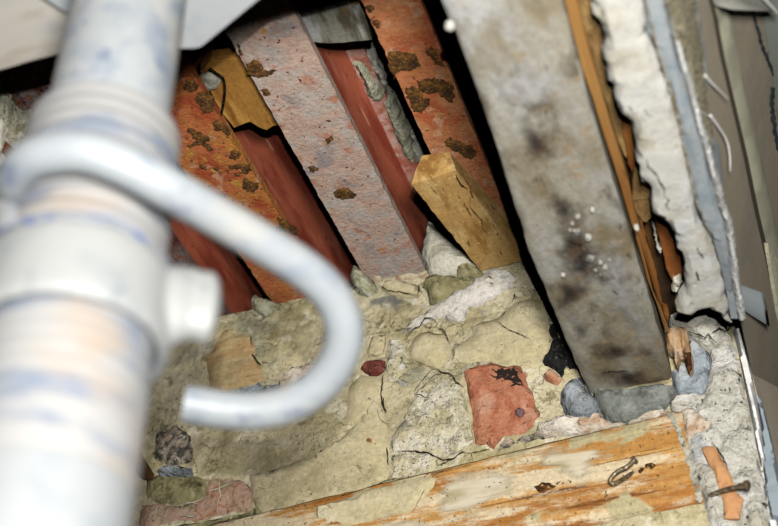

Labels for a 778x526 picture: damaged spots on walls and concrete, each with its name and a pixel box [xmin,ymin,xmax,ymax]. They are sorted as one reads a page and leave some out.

efflorescence [501,74,548,103]
water stain [529,133,550,152]
water stain [557,200,569,215]
water stain [563,235,590,271]
efflorescence [402,268,516,332]
water stain [562,285,584,304]
crack [366,294,530,356]
crack [415,360,464,400]
water stain [608,372,644,384]
crack [377,376,390,425]
hole [534,481,560,493]